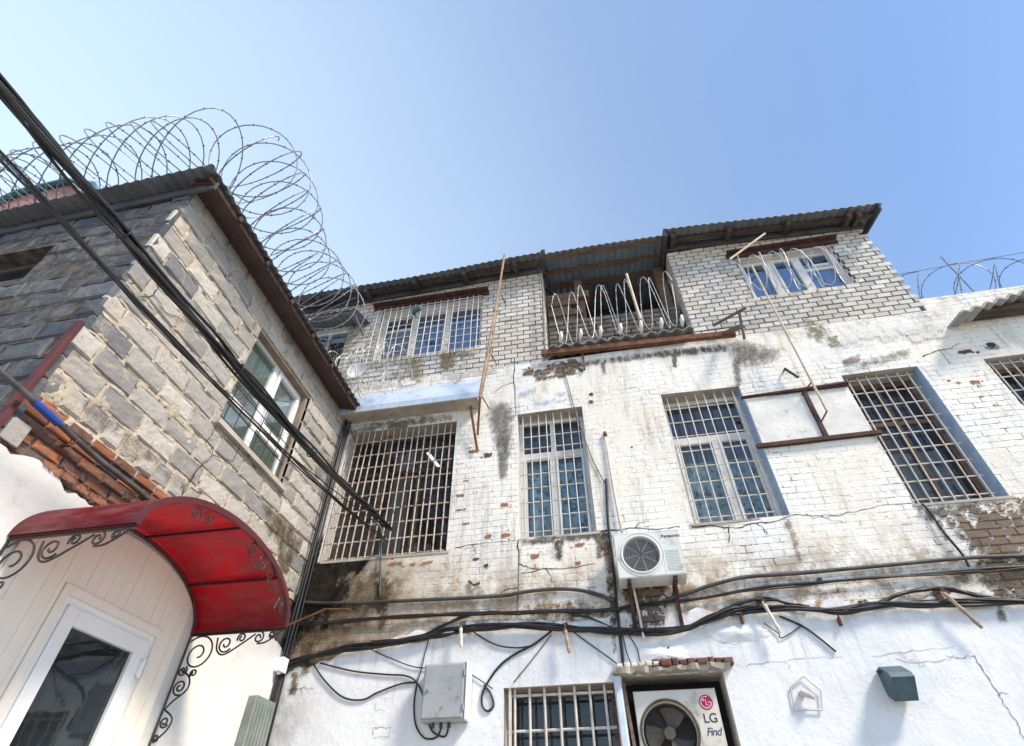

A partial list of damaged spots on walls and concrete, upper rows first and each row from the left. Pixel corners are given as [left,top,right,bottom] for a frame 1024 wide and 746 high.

spalling [522,359,583,381]
leakage [497,436,509,478]
peeling [44,461,112,506]
crack [601,503,906,542]
peeling [930,497,1024,598]
leakage [376,578,390,629]
peeling [622,586,679,628]
crack [881,646,1024,737]